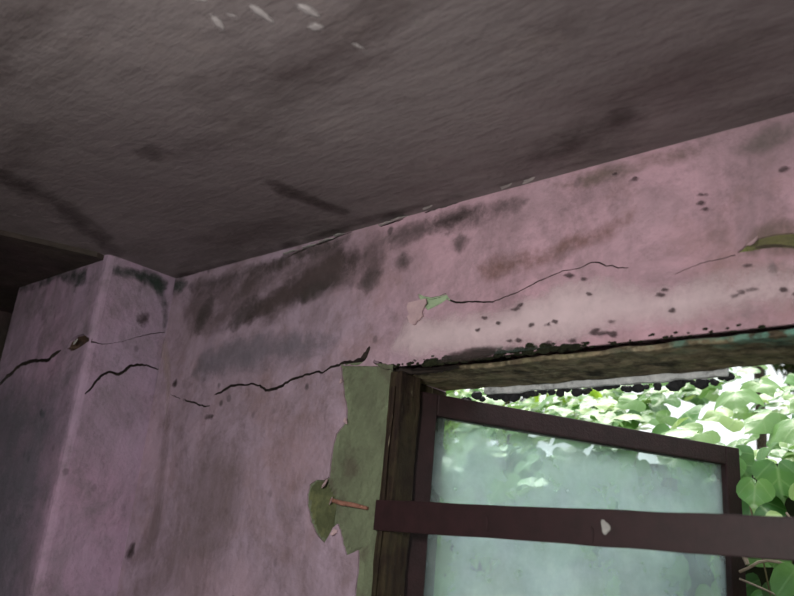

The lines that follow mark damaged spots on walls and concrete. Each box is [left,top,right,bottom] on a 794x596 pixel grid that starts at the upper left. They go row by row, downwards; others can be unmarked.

spalling [741,234,794,252]
leakage [190,243,377,329]
crack [450,262,629,303]
spalling [407,293,450,325]
leakage [589,320,616,337]
leakage [443,338,526,361]
crack [0,350,61,385]
crack [85,363,158,394]
crack [173,346,460,407]
spalling [308,362,393,596]